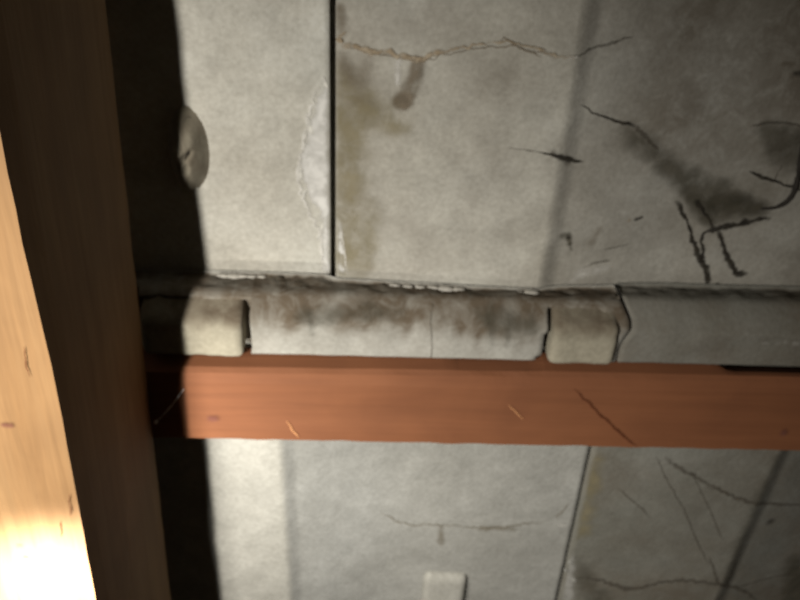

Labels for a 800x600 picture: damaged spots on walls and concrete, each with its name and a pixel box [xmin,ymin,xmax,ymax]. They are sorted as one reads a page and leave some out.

crack [336,32,618,63]
crack [583,106,655,146]
crack [523,149,581,163]
crack [751,168,800,191]
crack [678,201,766,285]
damp [389,283,466,291]
crack [592,464,795,593]